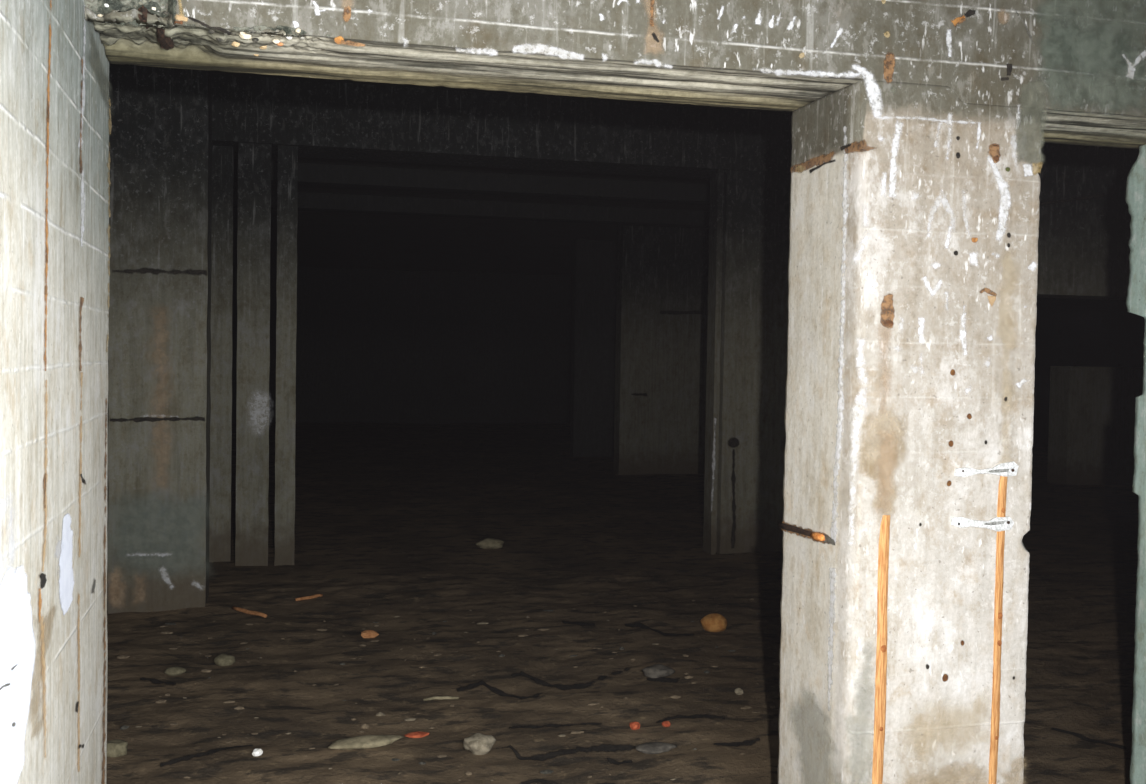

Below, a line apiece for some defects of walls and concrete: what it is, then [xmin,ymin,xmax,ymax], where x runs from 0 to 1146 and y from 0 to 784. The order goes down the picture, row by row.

corrosion [650,0,659,42]
corrosion [334,36,365,46]
corrosion [884,53,895,92]
corrosion [989,144,1001,163]
corrosion [42,26,52,571]
corrosion [881,294,895,328]